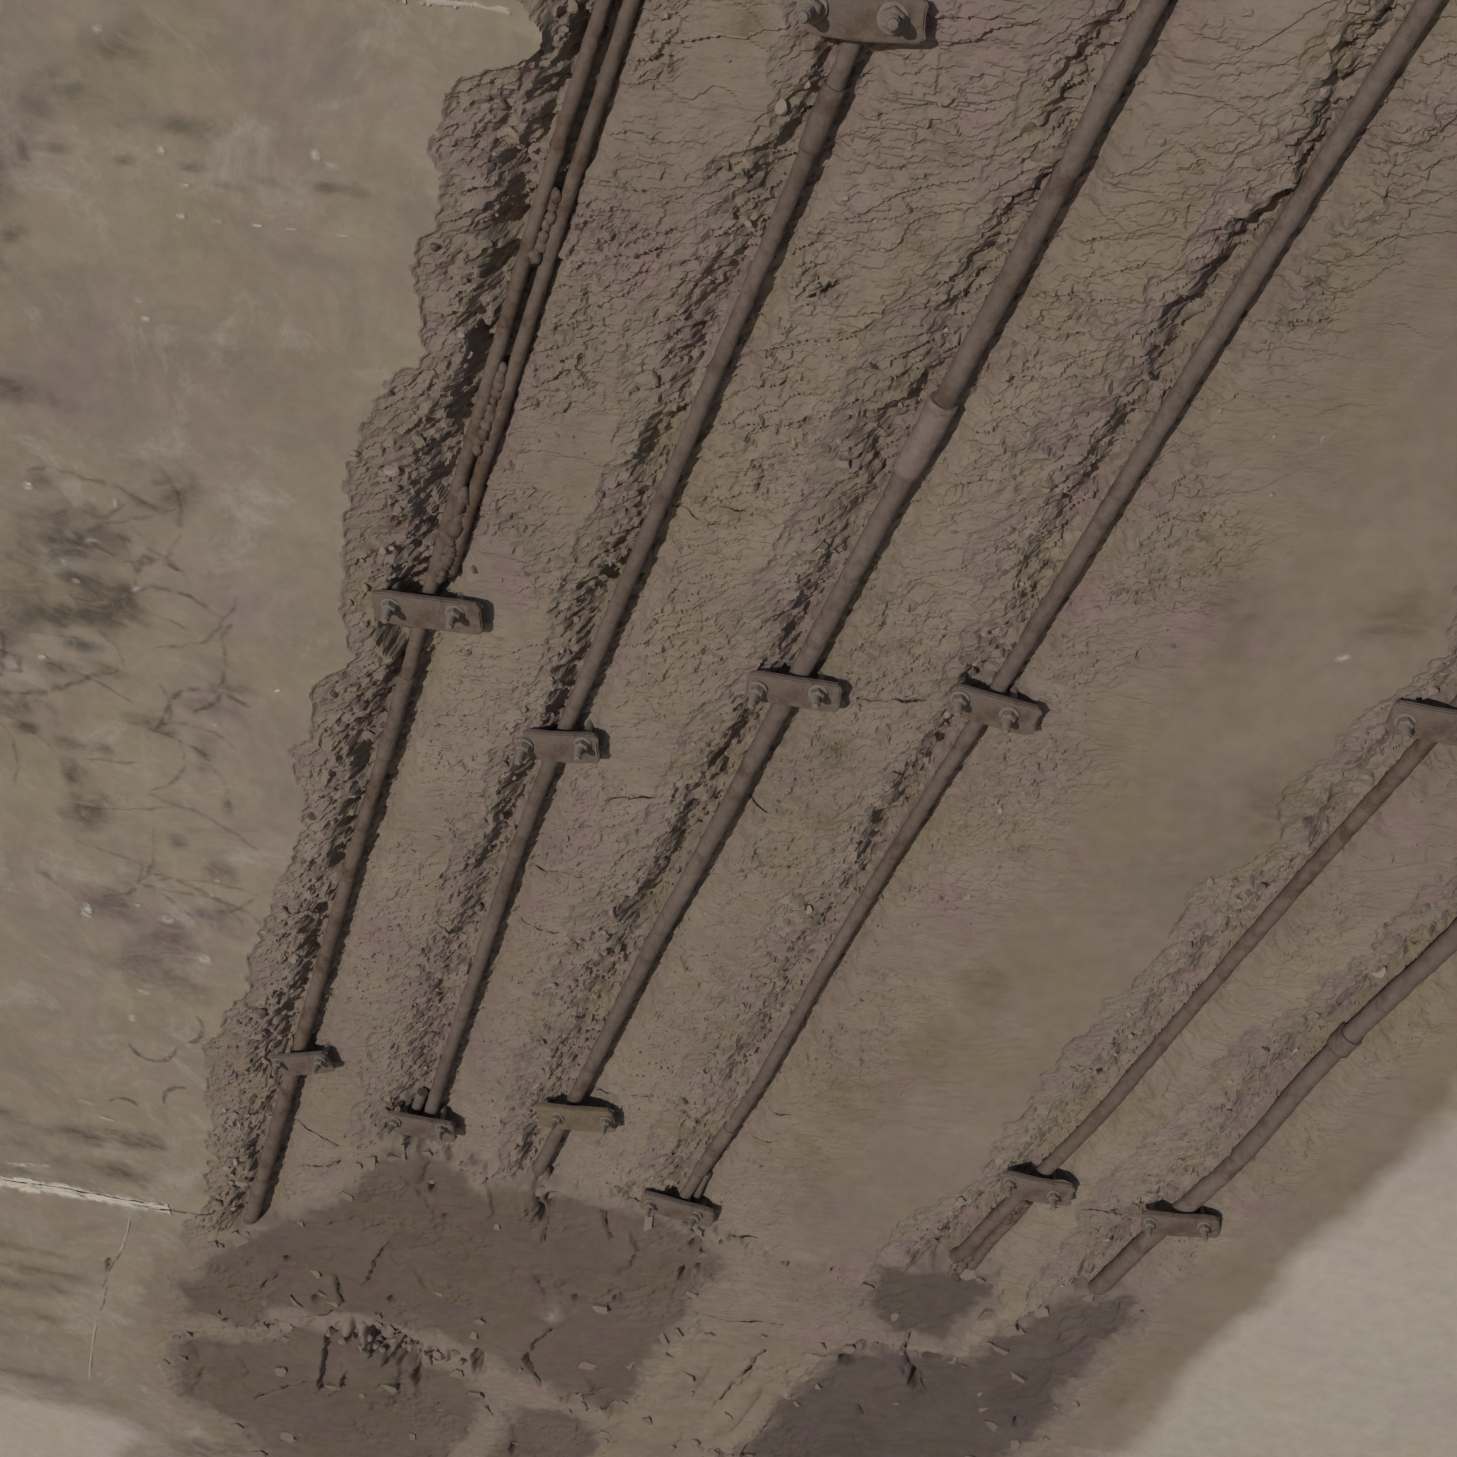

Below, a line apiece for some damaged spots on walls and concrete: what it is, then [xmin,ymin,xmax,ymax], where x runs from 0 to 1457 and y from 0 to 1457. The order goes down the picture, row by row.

crack [88,1321,97,1382]
crack [2,1179,210,1253]
spalling [179,0,596,1254]
spalling [326,1311,493,1416]
spalling [263,0,843,1208]
spalling [422,0,1457,1457]